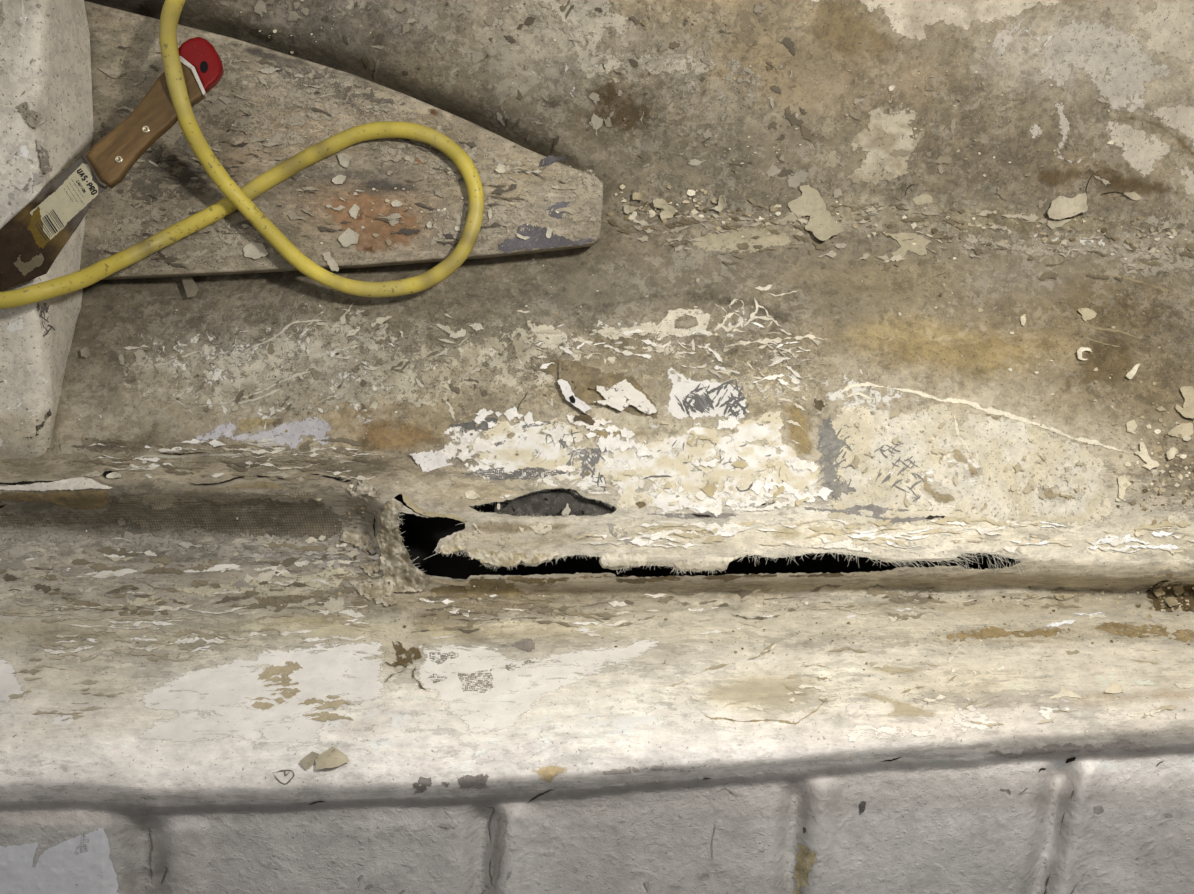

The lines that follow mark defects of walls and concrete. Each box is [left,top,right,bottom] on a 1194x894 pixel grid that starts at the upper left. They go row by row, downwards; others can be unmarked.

leakage [816,0,891,58]
leakage [1041,172,1074,186]
leakage [1089,171,1168,193]
peeling [0,302,1194,553]
crack [365,487,1032,599]
peeling [0,503,976,770]
spalling [946,582,1194,672]
peeling [914,694,997,733]
peeling [1038,687,1082,722]
peeling [990,739,1148,759]
peeling [603,765,706,784]